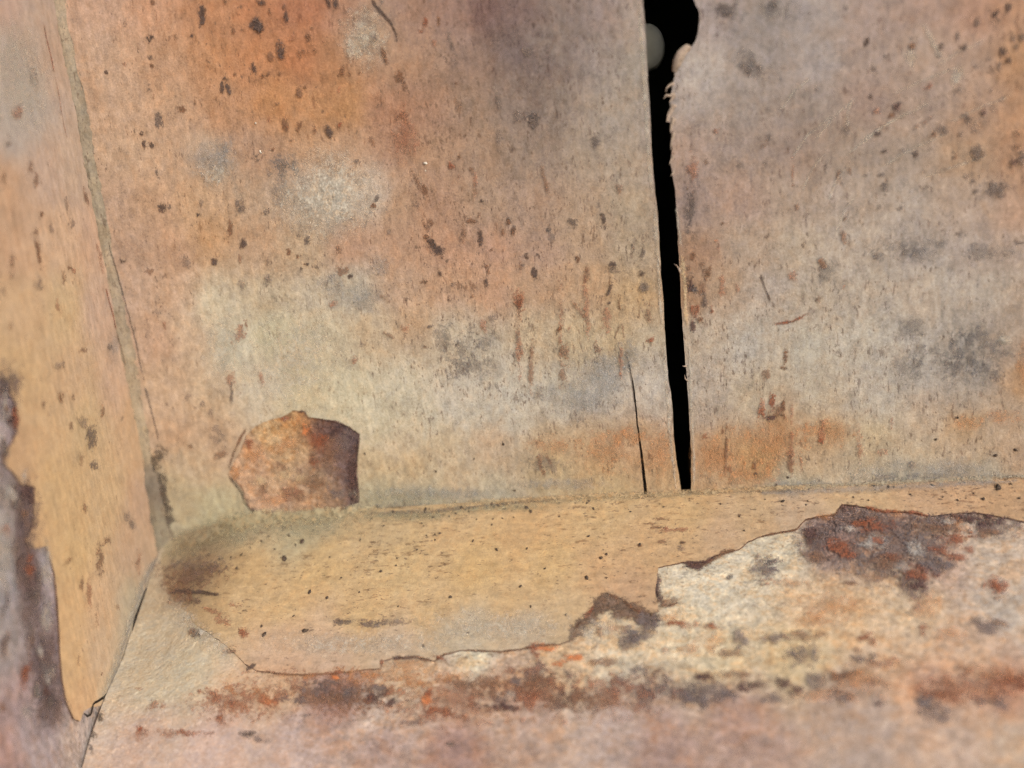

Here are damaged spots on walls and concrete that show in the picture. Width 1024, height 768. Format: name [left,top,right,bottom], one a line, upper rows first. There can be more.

crack [615,301,647,494]
corrosion [271,423,359,505]
peeling [0,382,1024,768]
corrosion [682,549,734,571]
corrosion [762,502,1024,610]
corrosion [246,663,399,720]
corrosion [380,576,889,722]
corrosion [913,668,1024,724]